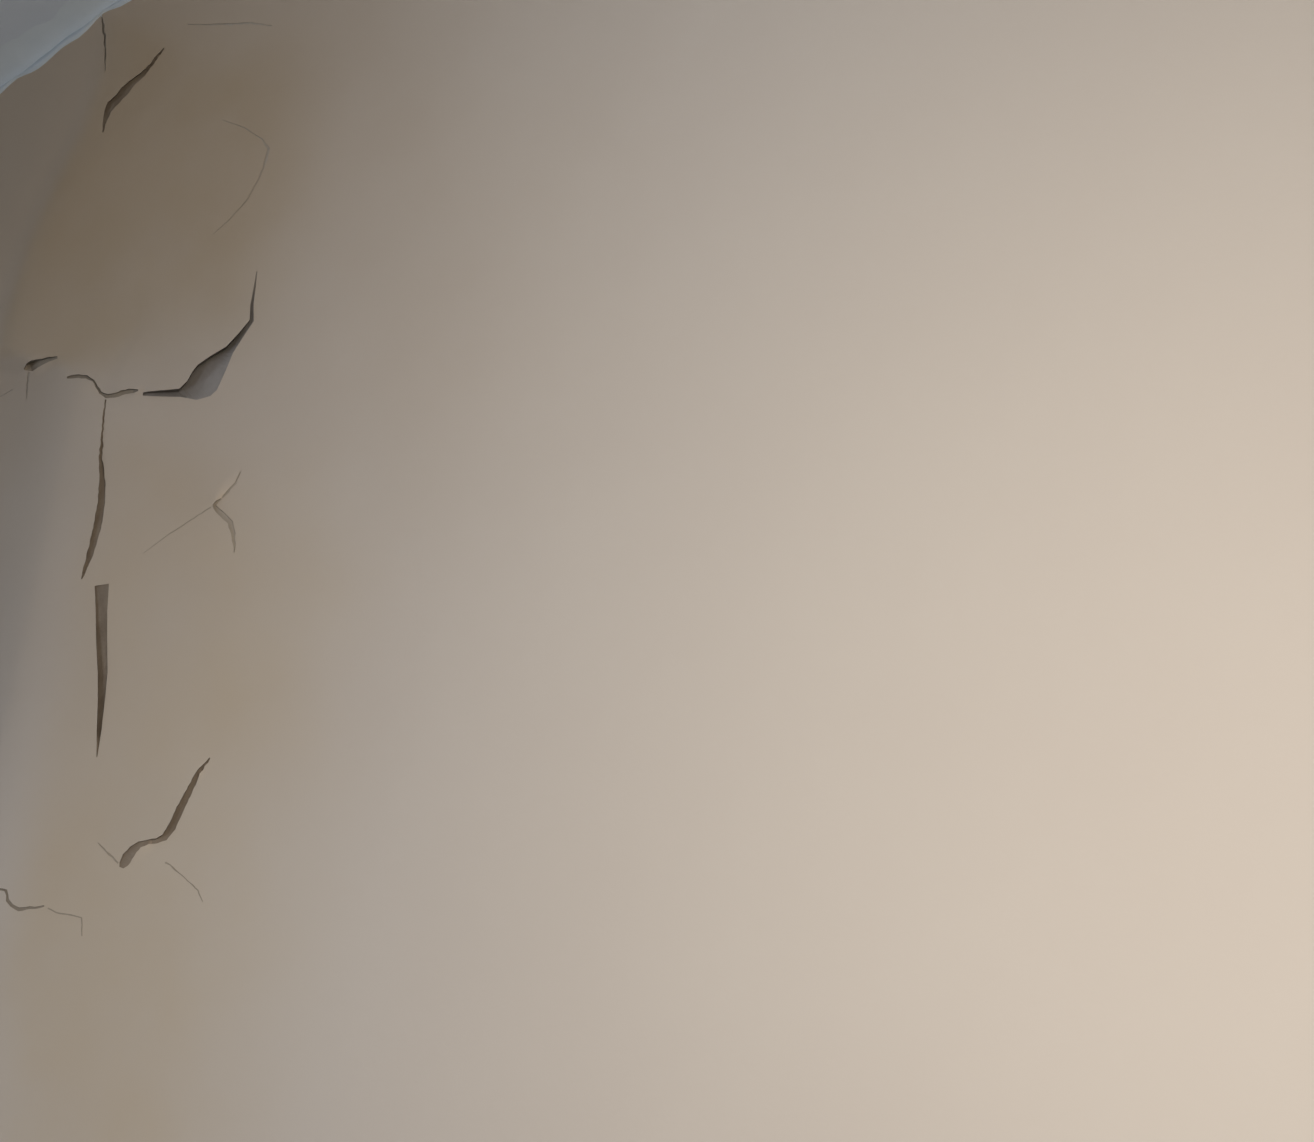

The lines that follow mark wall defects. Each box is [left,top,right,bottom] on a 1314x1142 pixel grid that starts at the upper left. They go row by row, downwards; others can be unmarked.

crack [101,17,164,132]
crack [67,374,138,757]
crack [144,472,241,553]
crack [98,758,210,902]
crack [0,888,83,936]